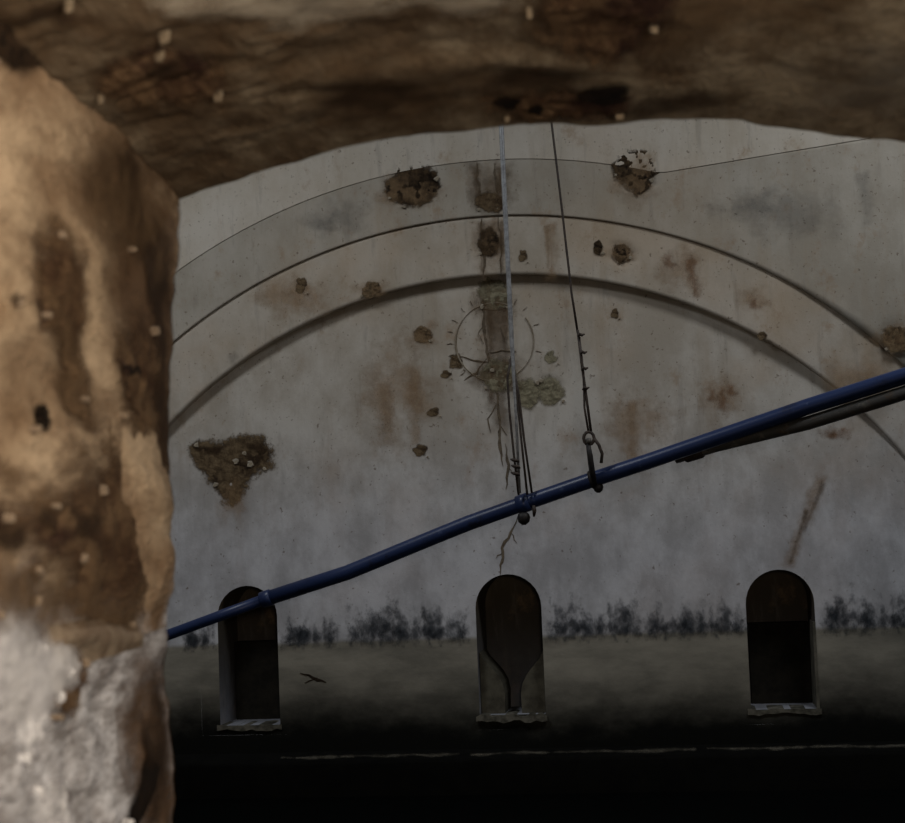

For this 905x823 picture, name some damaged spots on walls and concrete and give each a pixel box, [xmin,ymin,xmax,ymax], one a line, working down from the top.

flaking render [479,85,641,125]
flaking render [385,166,441,209]
flaking render [612,150,654,197]
flaking render [477,226,499,257]
leakage [92,137,177,505]
flaking render [881,325,905,353]
flaking render [116,321,161,438]
flaking render [189,433,276,507]
leakage [120,659,176,823]
crack [123,735,162,823]